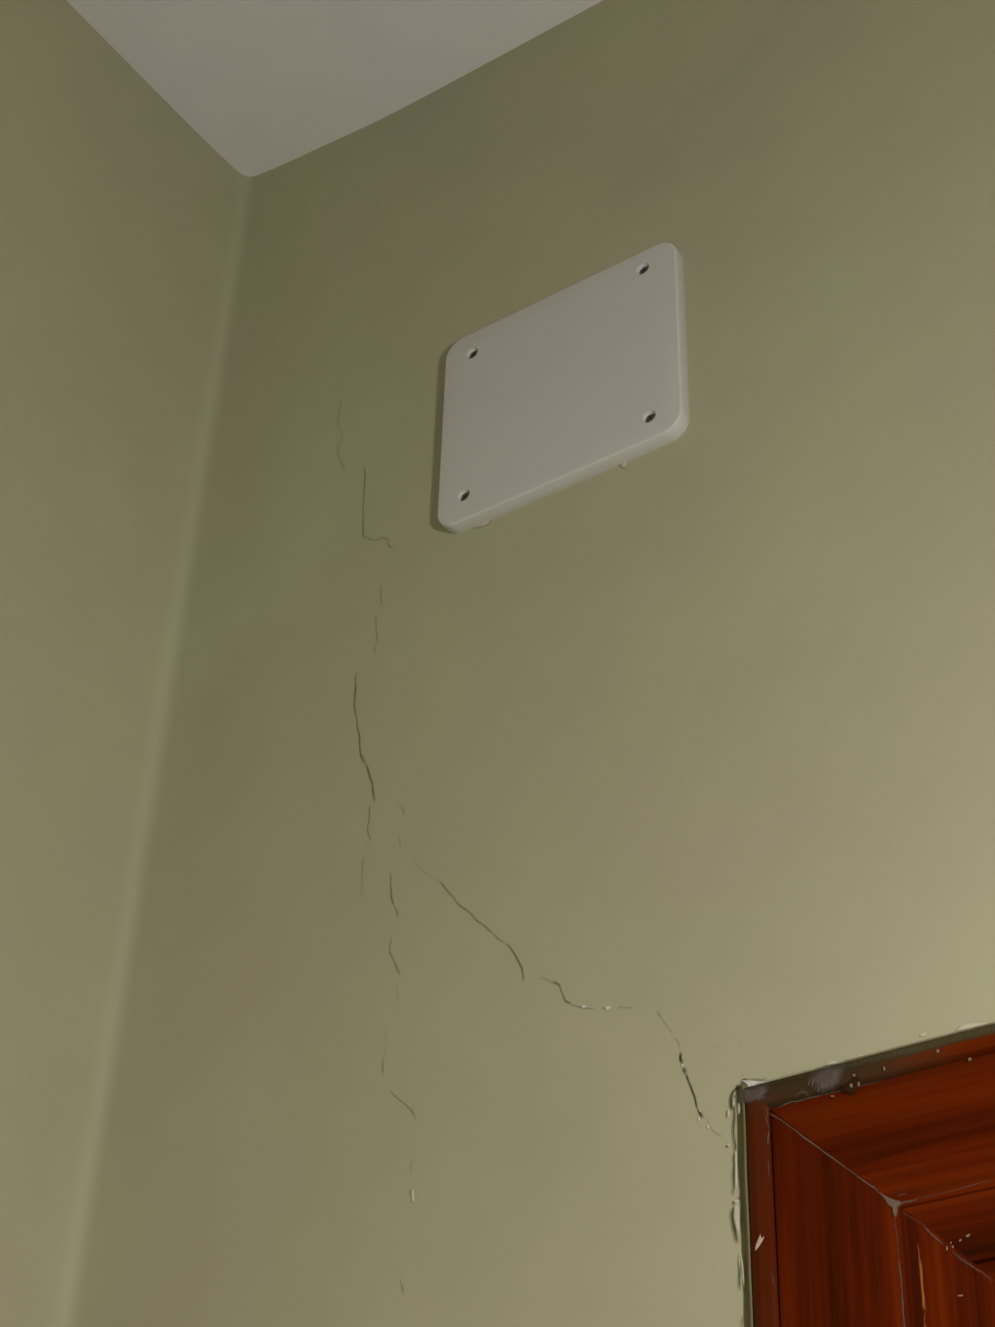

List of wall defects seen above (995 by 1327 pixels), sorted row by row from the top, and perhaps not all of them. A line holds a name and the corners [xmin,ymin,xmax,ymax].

crack [679,1054,745,1240]